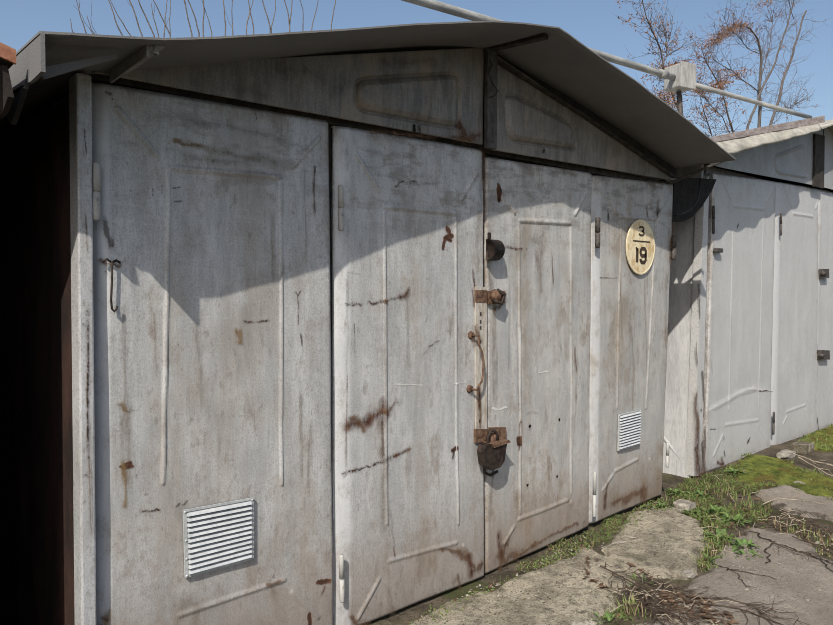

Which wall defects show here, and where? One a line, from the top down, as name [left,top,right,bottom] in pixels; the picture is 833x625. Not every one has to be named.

corrosion [442,226,454,250]
corrosion [344,402,398,457]
corrosion [119,461,134,507]
corrosion [439,548,483,576]
corrosion [497,522,579,571]